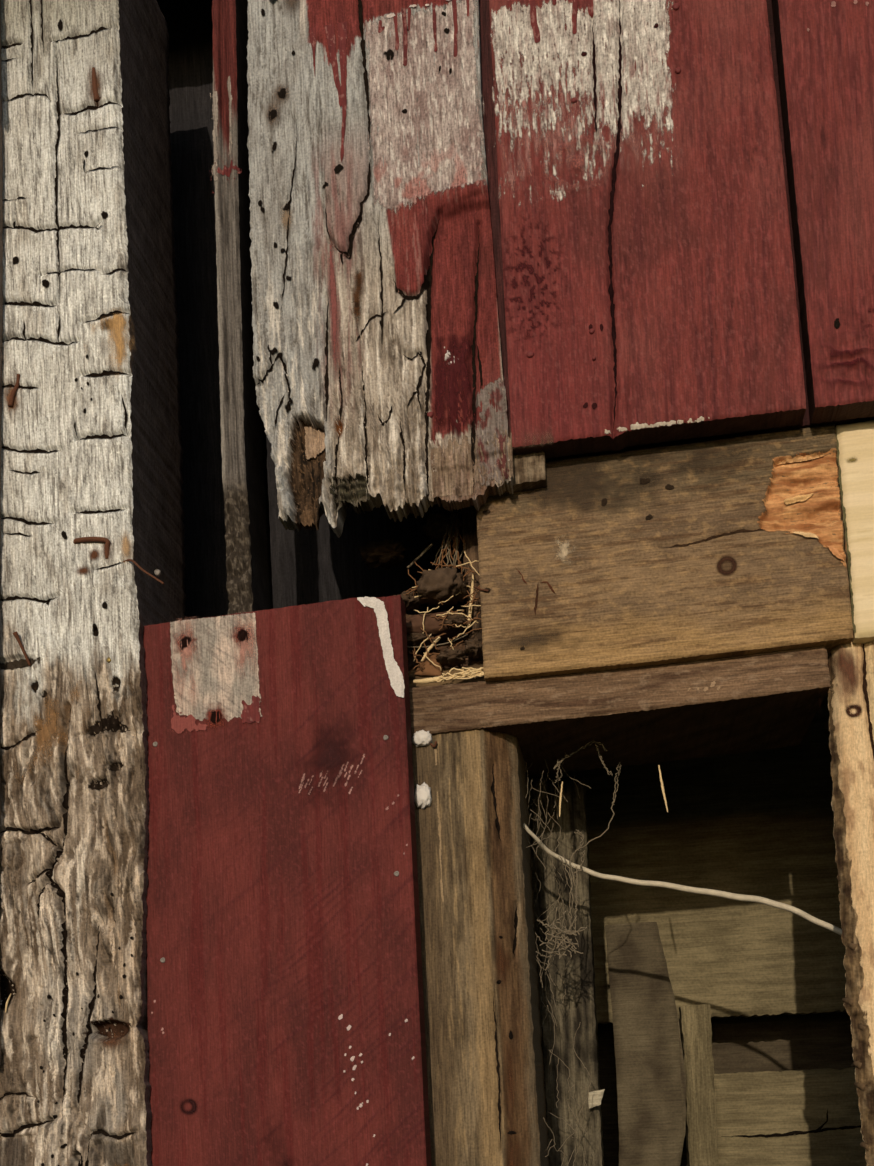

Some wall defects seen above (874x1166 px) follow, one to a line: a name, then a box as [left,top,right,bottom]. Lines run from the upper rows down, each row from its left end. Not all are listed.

crack [1,0,129,345]
crack [324,0,439,509]
peeling [363,0,674,213]
crack [592,0,622,441]
crack [2,370,129,474]
rust [77,547,109,574]
rust [101,313,126,365]
peeling [304,426,325,459]
spalling [328,473,370,503]
peeling [430,335,513,498]
peeling [170,613,262,734]
crack [0,674,135,1166]